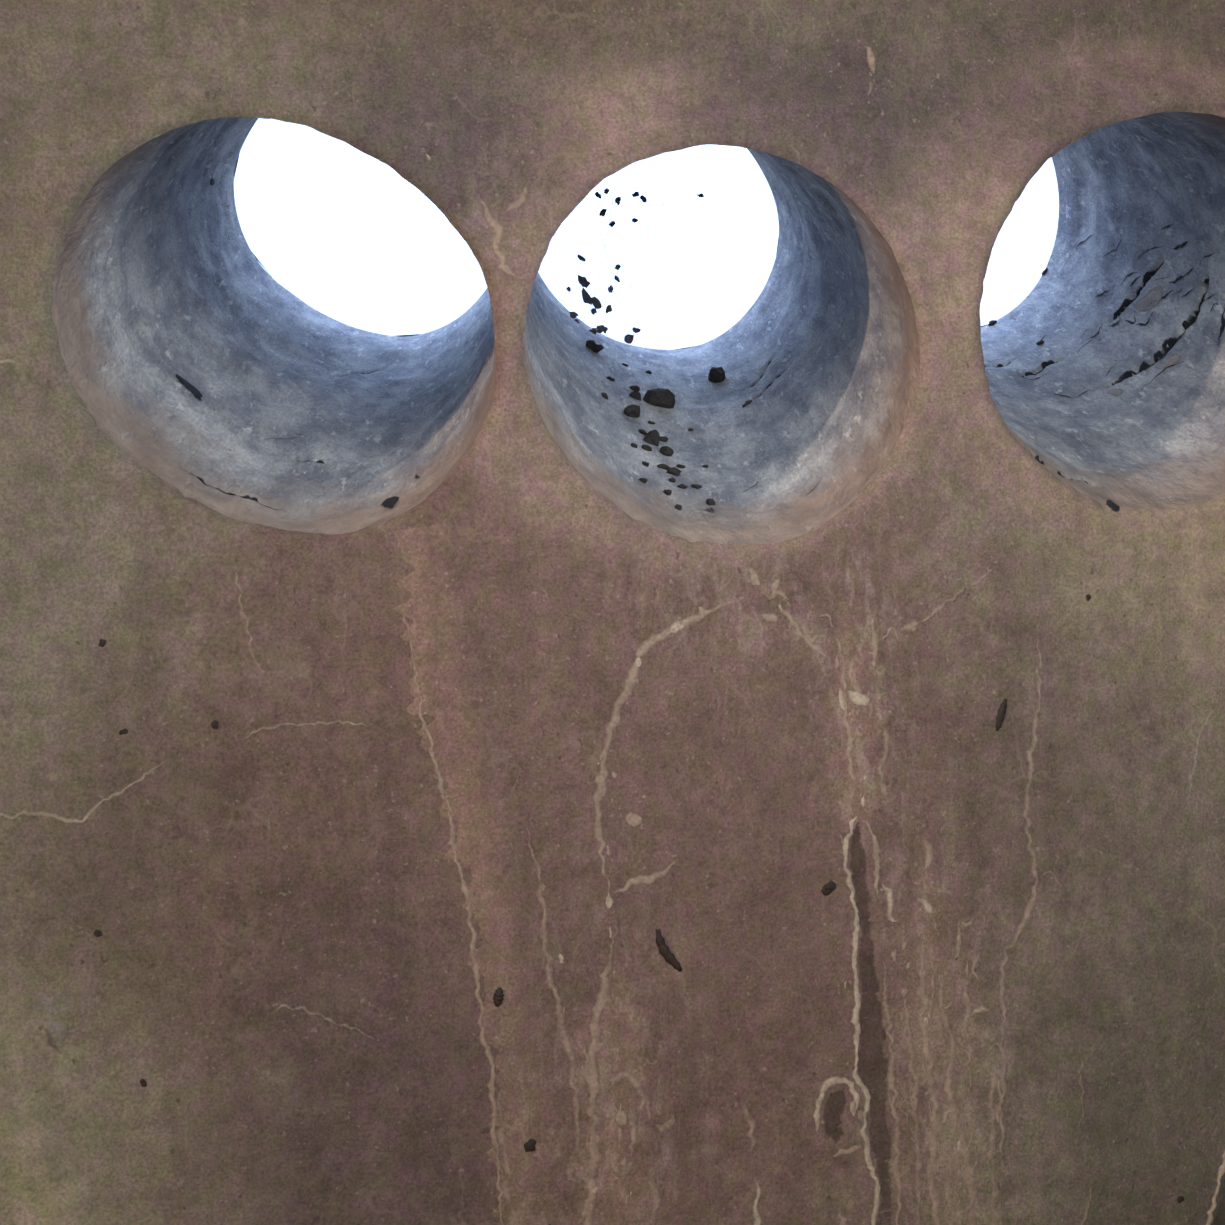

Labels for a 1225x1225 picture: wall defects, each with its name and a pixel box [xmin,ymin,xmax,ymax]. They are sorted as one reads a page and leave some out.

damp [813,837,1044,1225]